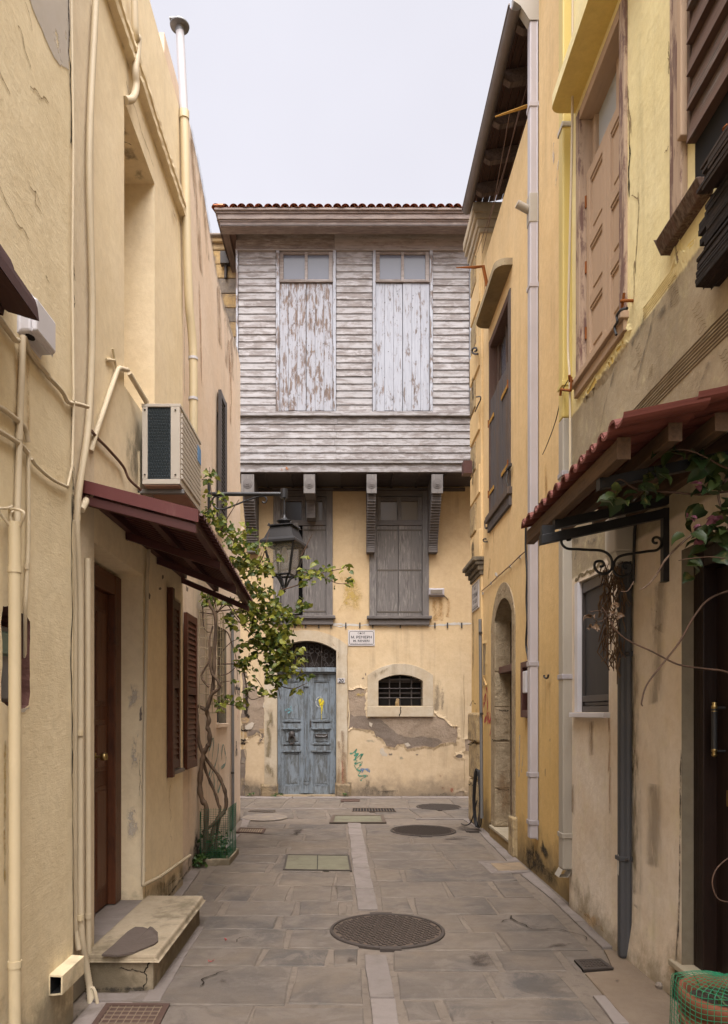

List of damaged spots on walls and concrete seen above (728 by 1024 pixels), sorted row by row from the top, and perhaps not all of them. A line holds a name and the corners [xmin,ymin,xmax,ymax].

peeling [30,0,71,70]
flaking render [240,670,264,796]
flaking render [347,673,472,762]
damp [526,840,556,881]